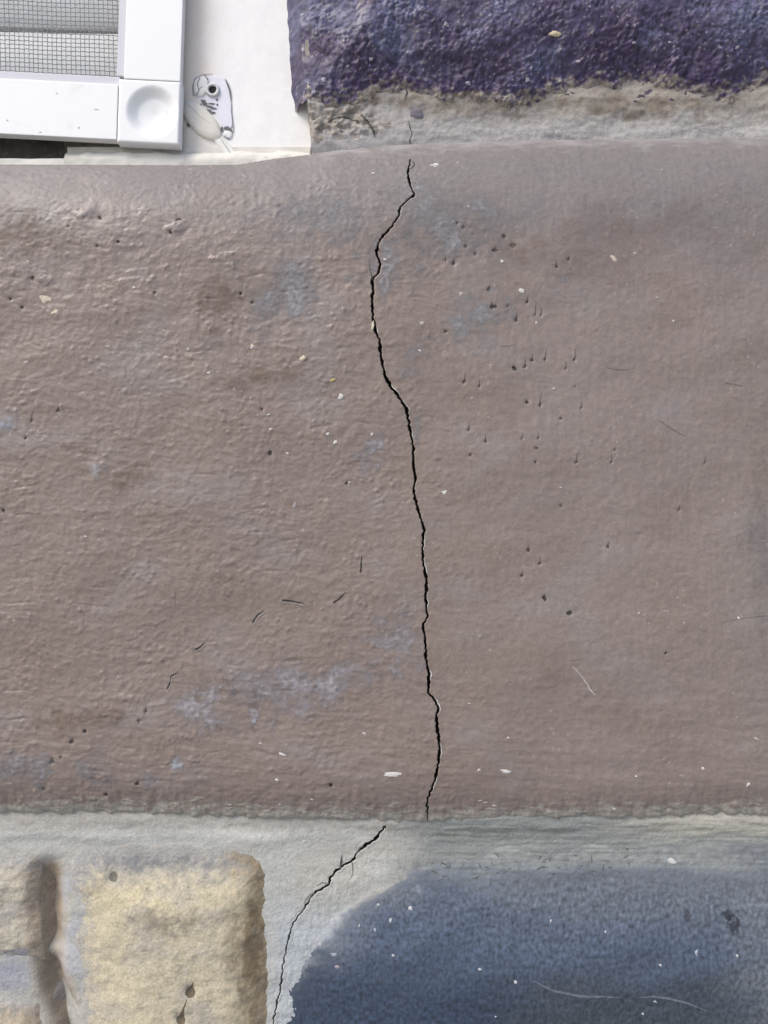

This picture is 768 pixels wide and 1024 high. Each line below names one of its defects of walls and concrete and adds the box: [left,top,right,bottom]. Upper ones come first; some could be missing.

crack [369,89,442,814]
crack [273,826,385,1022]